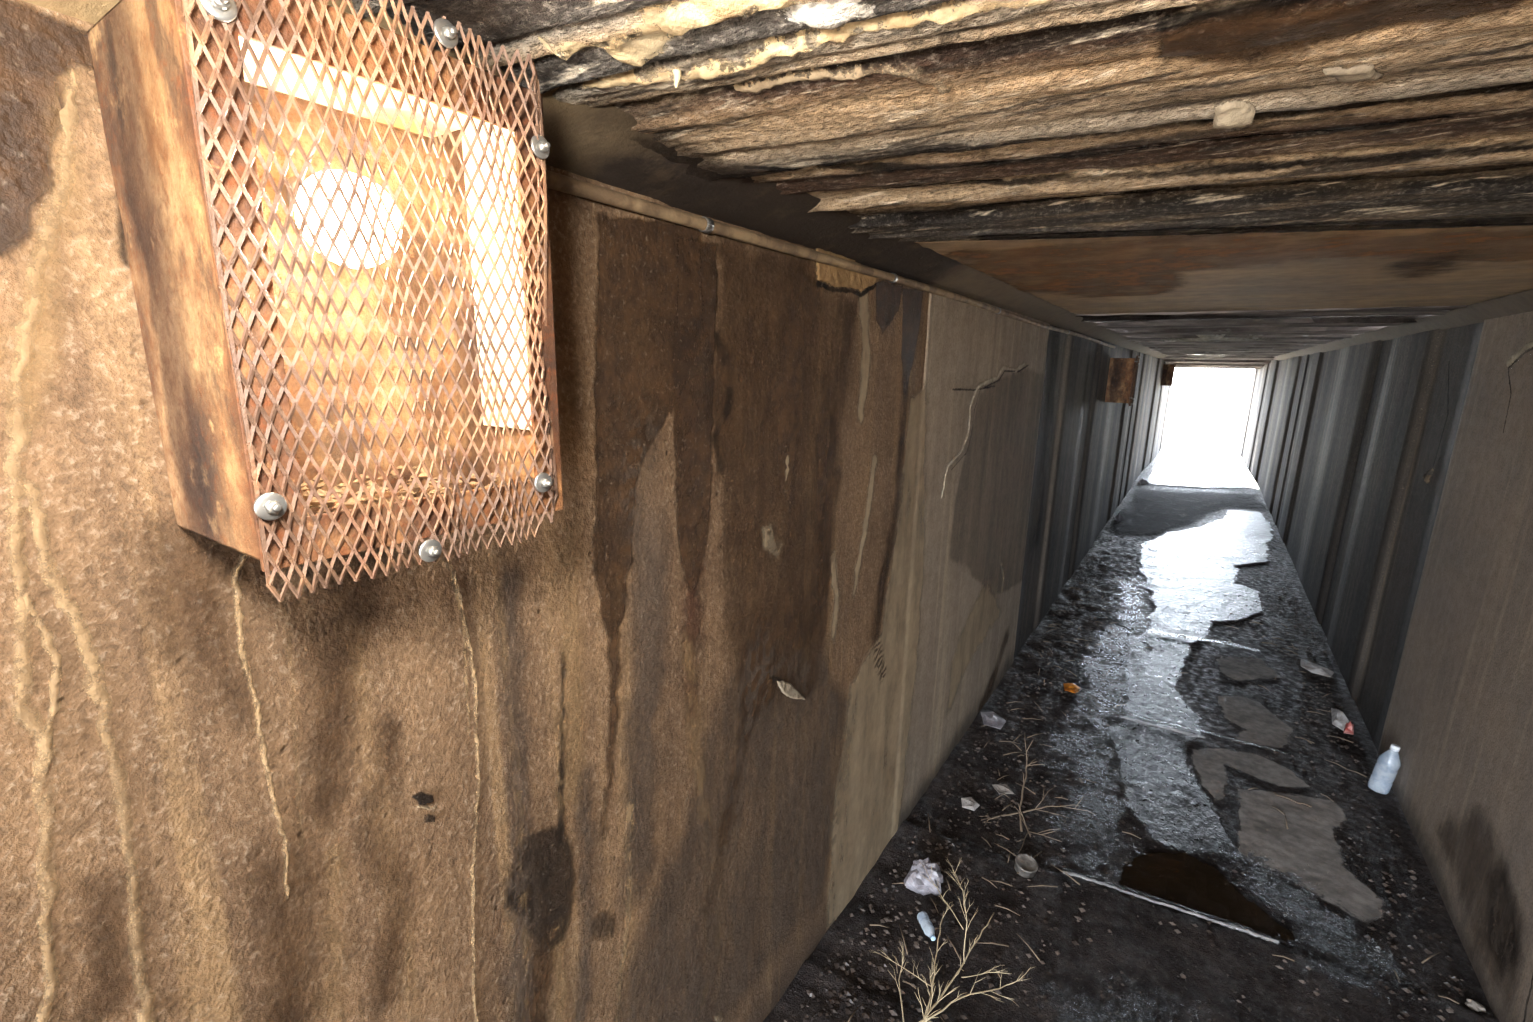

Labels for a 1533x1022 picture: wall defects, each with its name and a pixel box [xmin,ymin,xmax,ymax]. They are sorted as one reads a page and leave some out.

water stain [119,208,128,265]
peeling [1213,100,1256,129]
peeling [1323,64,1384,83]
water stain [0,0,126,1022]
water stain [89,856,152,1019]
water stain [159,530,308,1022]
water stain [313,553,373,819]
water stain [447,560,481,824]
water stain [471,842,479,1022]
water stain [507,652,591,1022]
water stain [592,213,927,1022]